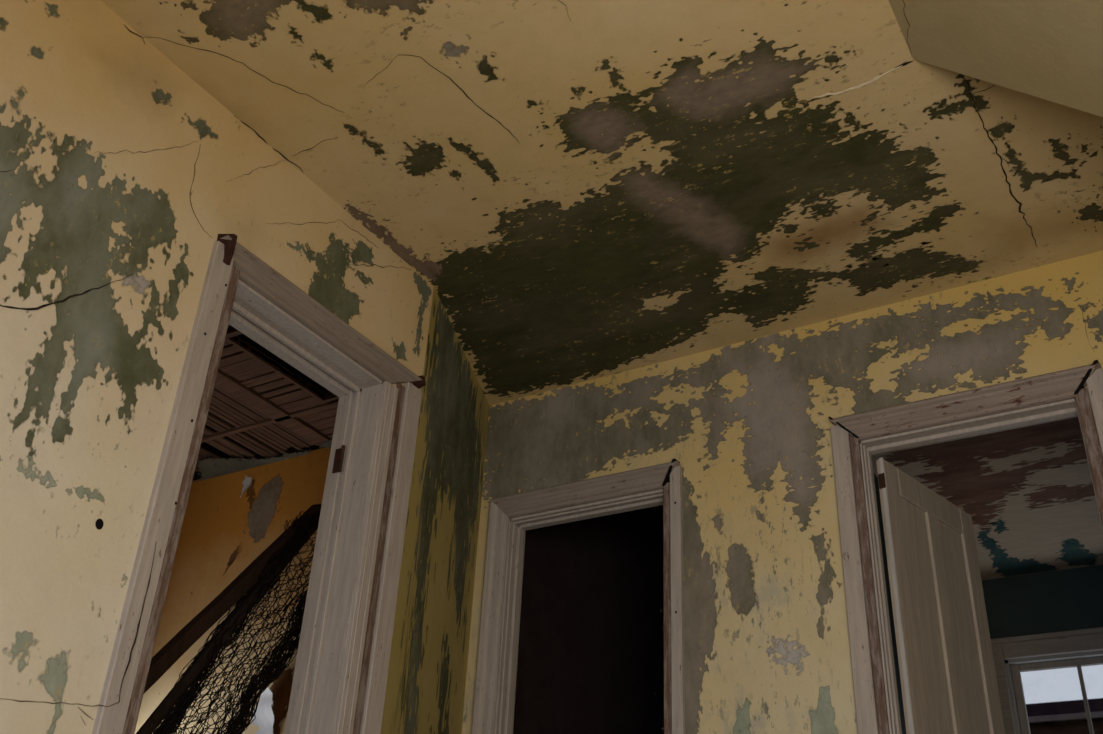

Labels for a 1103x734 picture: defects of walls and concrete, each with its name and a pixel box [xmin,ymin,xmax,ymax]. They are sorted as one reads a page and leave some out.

peeling [31,46,44,59]
crack [98,144,211,237]
crack [125,26,342,180]
crack [366,55,518,141]
crack [964,79,1037,246]
crack [0,274,133,311]
peeling [0,89,194,502]
peeling [287,30,1103,734]
crack [0,545,156,724]